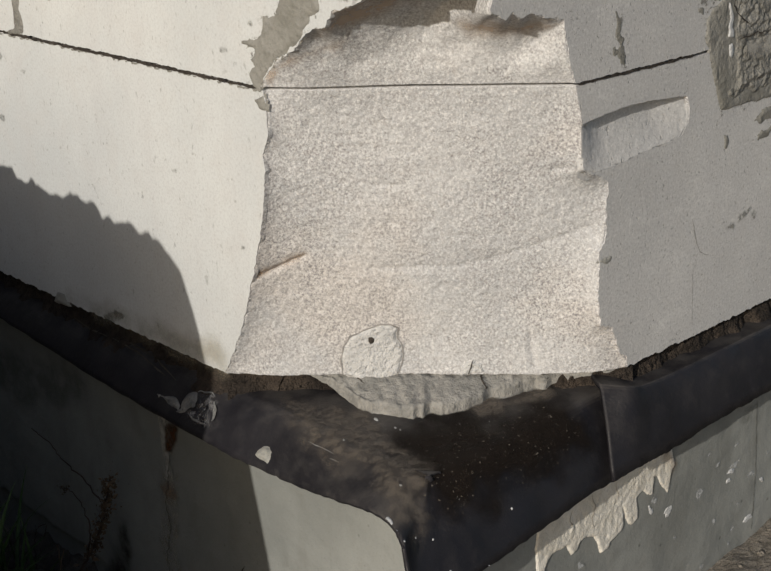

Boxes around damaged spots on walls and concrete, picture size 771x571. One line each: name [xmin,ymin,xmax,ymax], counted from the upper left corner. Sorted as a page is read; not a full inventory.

crack [0,30,260,91]
crack [578,55,695,85]
spalling [223,0,627,376]
rust [165,424,177,452]
peeling [535,450,675,571]